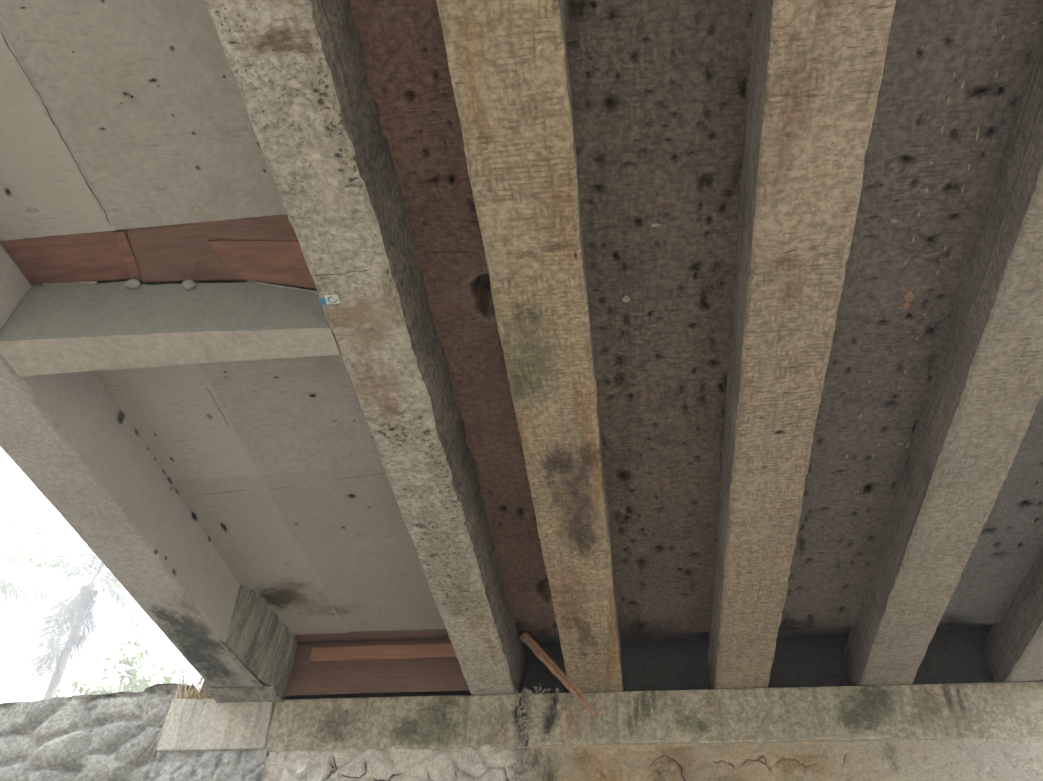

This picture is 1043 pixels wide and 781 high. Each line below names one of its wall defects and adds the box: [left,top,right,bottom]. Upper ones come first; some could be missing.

damp [545,448,599,550]
damp [154,609,234,684]
crack [515,696,528,750]
damp [815,686,892,739]
crack [325,756,458,781]
crack [650,755,685,781]
crack [712,756,818,771]